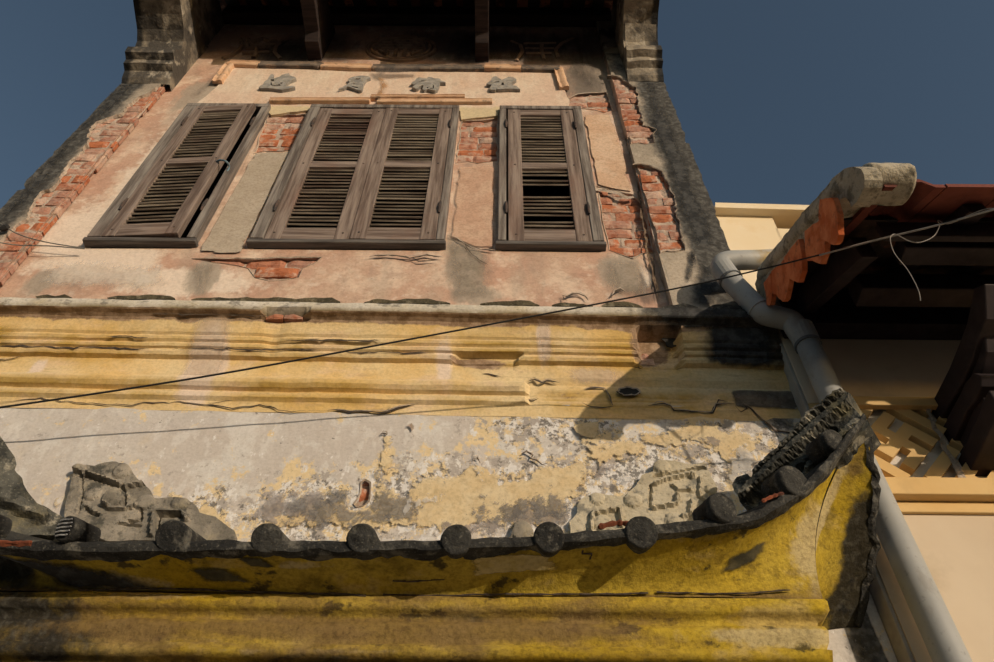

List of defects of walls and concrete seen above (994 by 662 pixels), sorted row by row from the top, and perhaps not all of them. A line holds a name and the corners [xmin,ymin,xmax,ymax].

flaking render [0,87,166,286]
flaking render [192,256,323,281]
flaking render [253,114,306,154]
peeling [452,118,499,247]
flaking render [568,75,686,259]
leakage [640,82,772,367]
peeling [246,423,761,535]